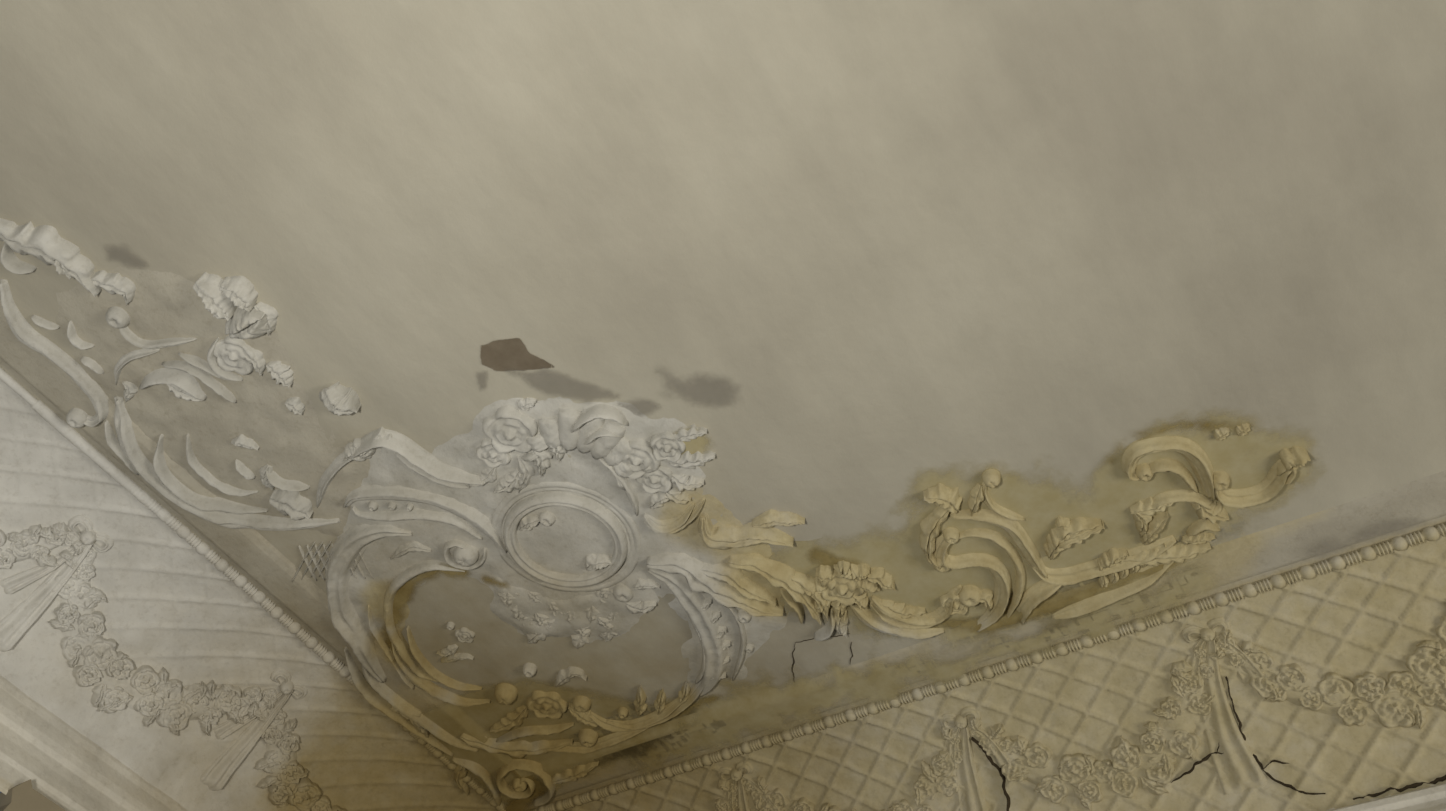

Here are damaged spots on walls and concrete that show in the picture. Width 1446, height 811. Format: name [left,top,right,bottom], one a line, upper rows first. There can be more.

peeling [481,338,554,371]
leakage [421,415,1311,811]
crack [1171,676,1446,800]